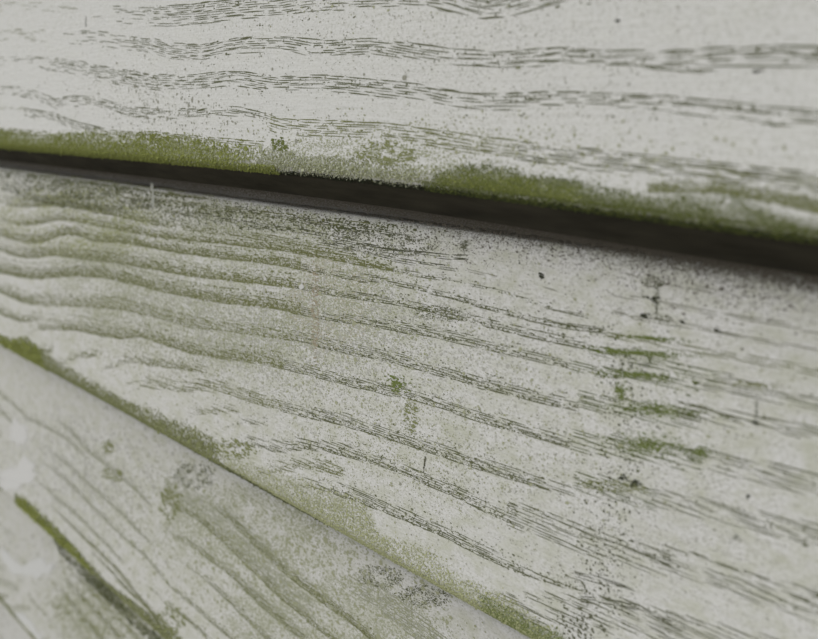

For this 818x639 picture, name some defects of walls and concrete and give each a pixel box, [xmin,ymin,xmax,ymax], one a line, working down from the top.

damp [80,0,785,204]